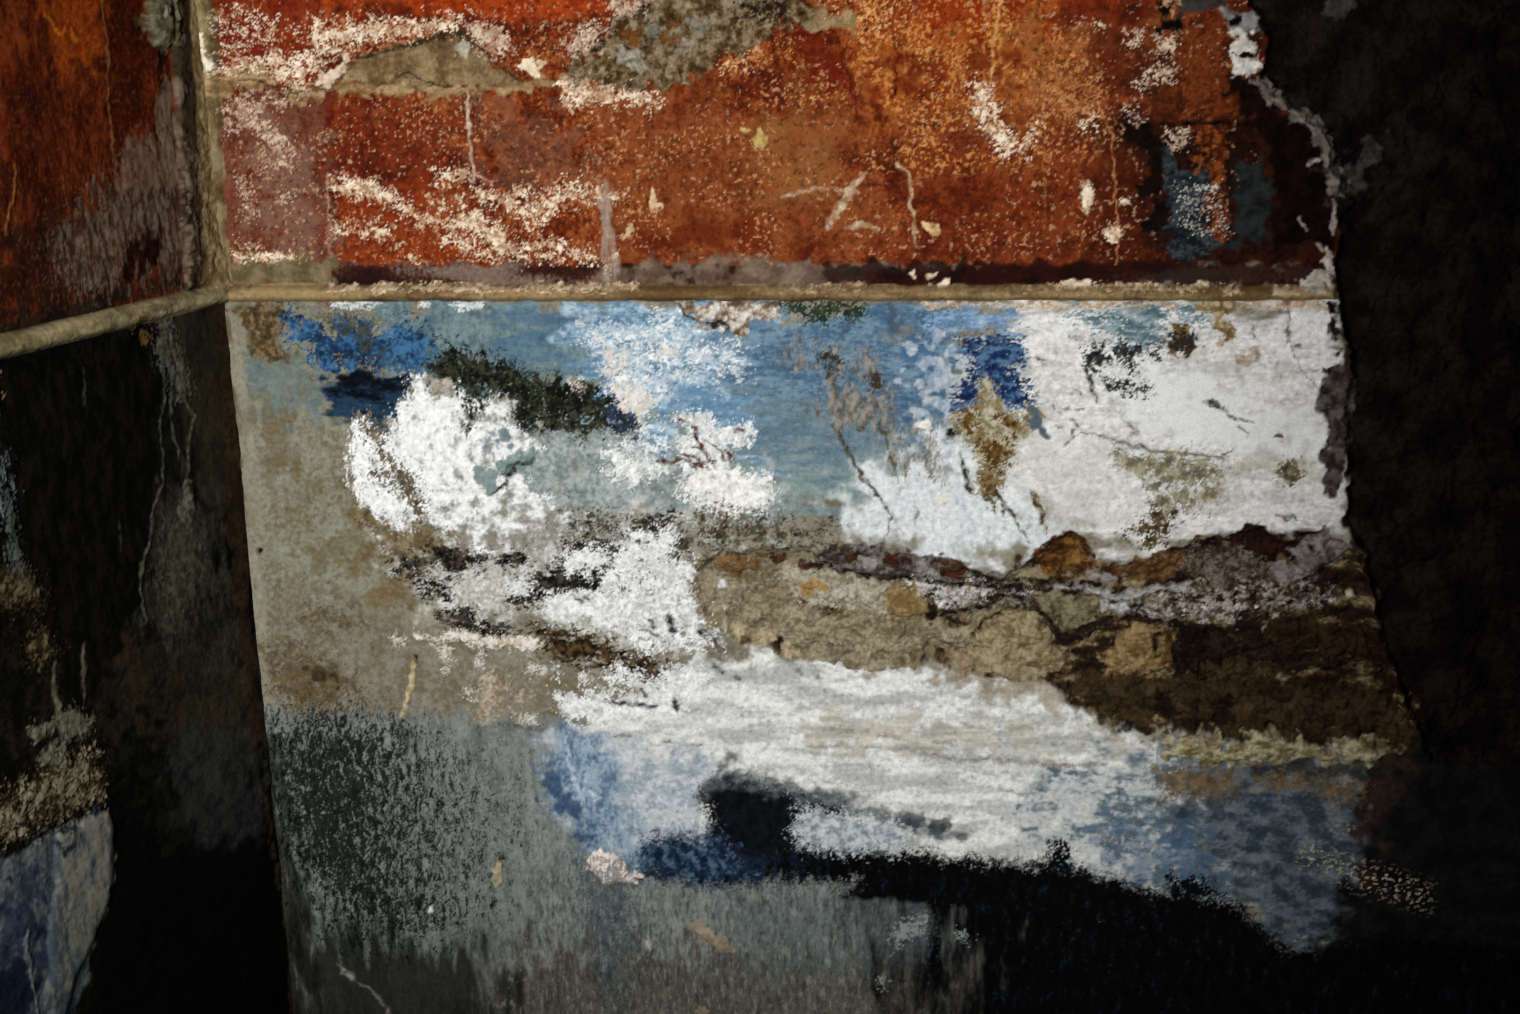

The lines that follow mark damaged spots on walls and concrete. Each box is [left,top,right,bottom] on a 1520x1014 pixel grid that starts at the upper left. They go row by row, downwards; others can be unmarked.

peeling [33,0,1196,366]
crack [828,418,922,541]
flaking render [321,0,1520,775]
leakage [255,586,1520,1014]